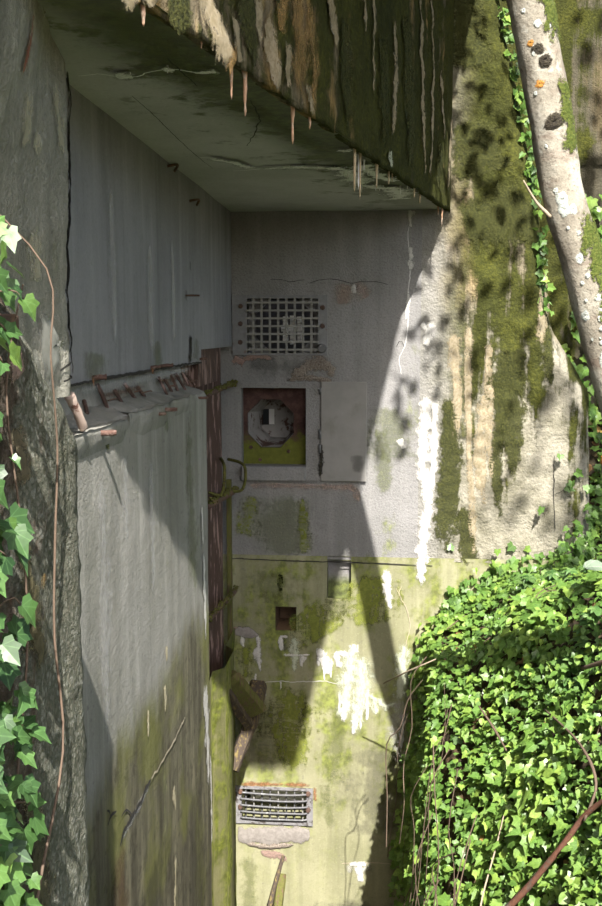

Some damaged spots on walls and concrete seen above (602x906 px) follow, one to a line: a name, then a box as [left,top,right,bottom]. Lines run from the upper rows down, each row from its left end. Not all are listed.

crack [81,58,346,171]
damp [334,0,453,200]
crack [272,210,416,374]
damp [536,274,555,386]
damp [414,327,530,583]
damp [240,635,262,684]
damp [278,635,410,734]
crack [107,718,185,847]
damp [203,685,213,844]